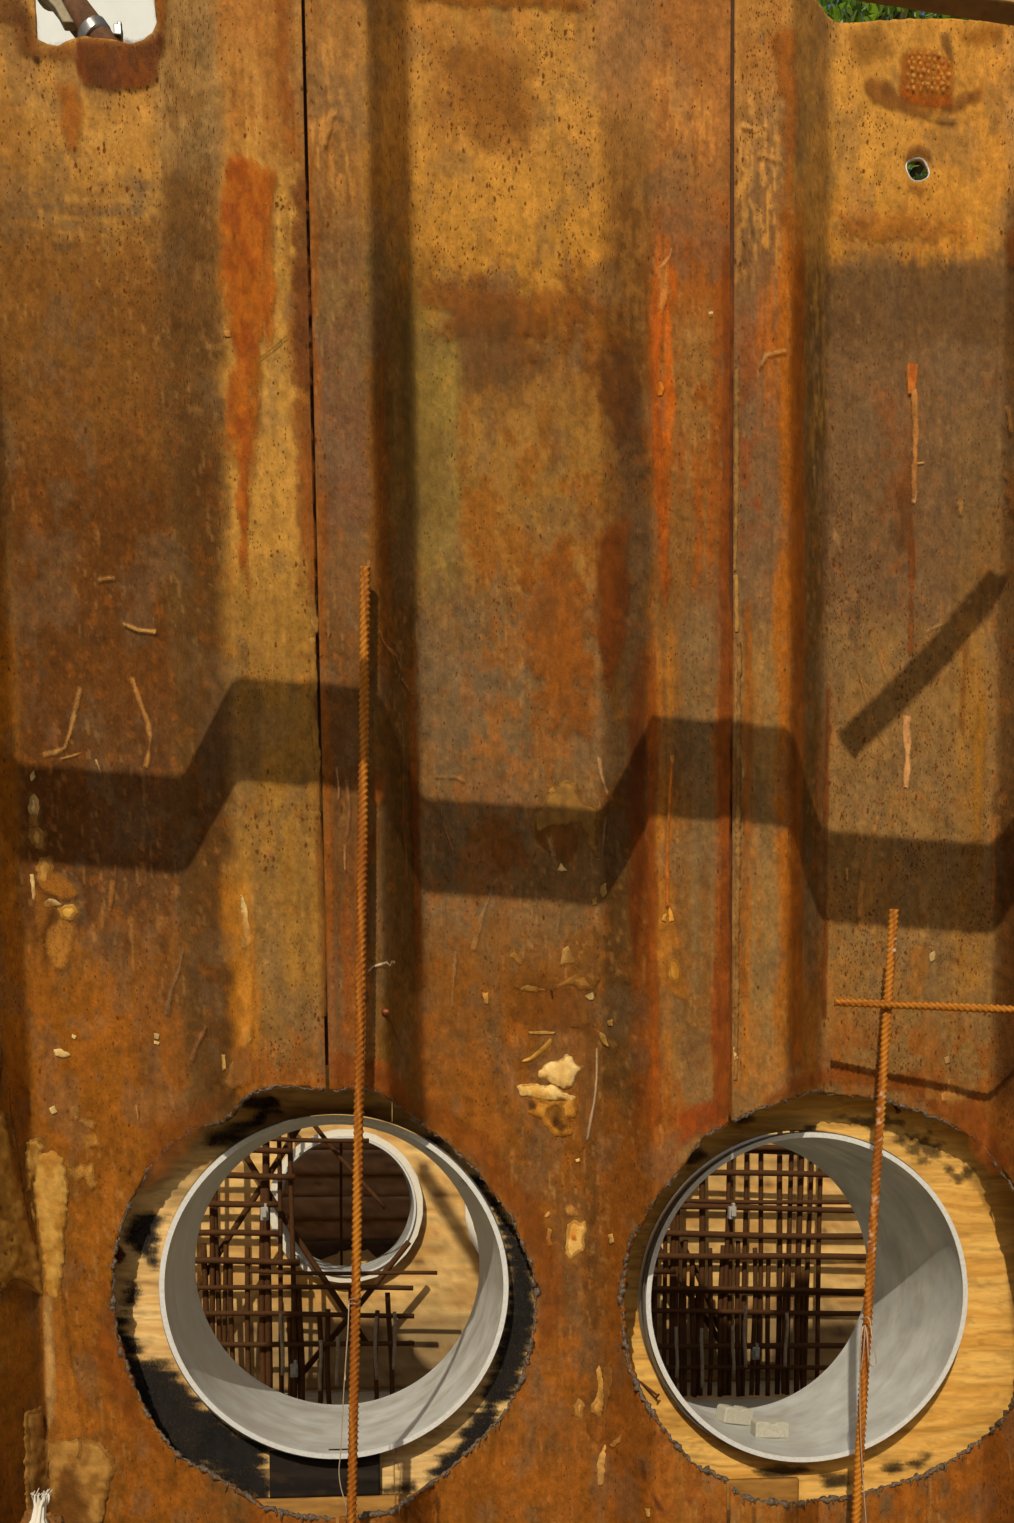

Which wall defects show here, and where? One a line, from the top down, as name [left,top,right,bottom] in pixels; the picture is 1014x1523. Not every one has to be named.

rust [0,0,166,147]
rust [900,48,953,107]
rust [906,145,930,160]
rust [218,152,314,591]
rust [907,363,924,654]
rust [646,241,733,1142]
peeling [28,771,78,968]
rust [367,822,378,865]
peeling [532,779,602,871]
rust [331,1053,416,1108]
peeling [509,925,613,1138]
rust [767,1066,1008,1173]